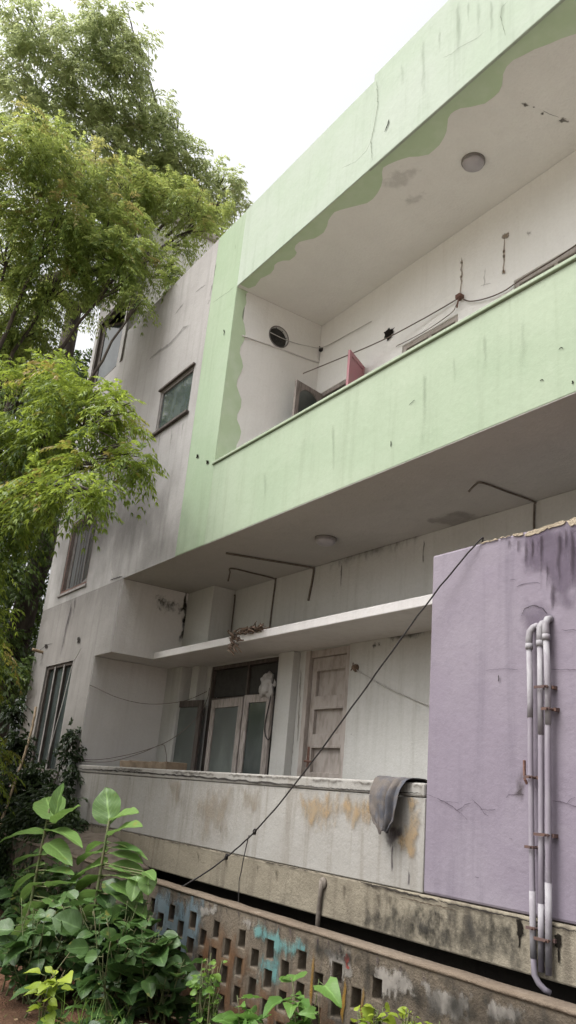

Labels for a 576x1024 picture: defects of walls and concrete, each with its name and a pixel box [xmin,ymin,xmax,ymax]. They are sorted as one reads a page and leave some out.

spalling [480,517,576,544]
damp [509,531,576,601]
damp [159,596,187,639]
crack [77,768,370,792]
crack [399,789,524,816]
damp [388,828,401,868]
peeling [243,920,305,982]
damp [365,908,514,958]
damp [400,987,519,1024]